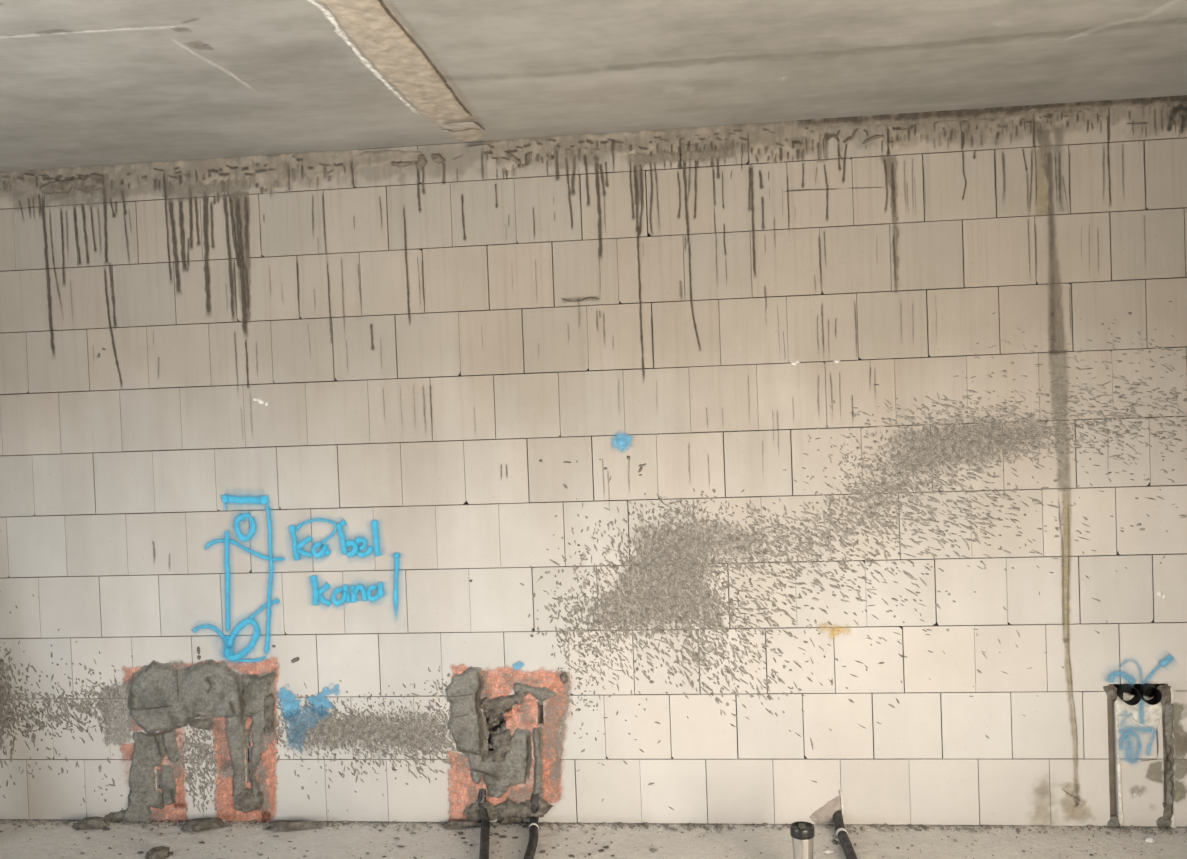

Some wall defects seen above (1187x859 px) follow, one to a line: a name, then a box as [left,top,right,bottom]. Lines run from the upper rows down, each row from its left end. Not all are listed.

leakage [1127,104,1187,133]
leakage [293,156,345,245]
leakage [391,154,446,211]
leakage [7,165,278,387]
leakage [327,264,344,340]
leakage [403,209,424,321]
leakage [485,109,1111,743]